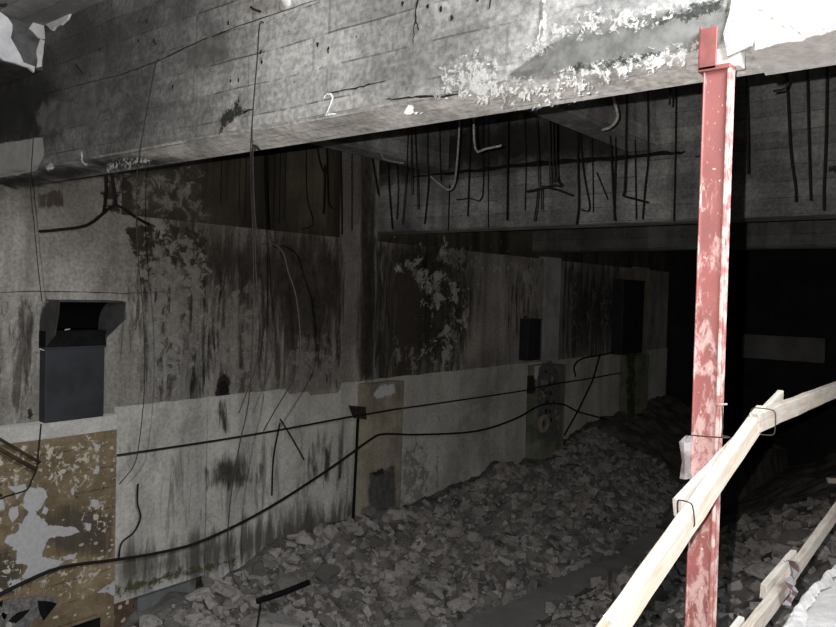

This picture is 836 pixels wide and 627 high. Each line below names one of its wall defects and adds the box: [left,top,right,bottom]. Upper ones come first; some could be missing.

flaking render [0,12,45,73]
crack [411,0,419,43]
spalling [510,0,730,86]
flaking render [755,0,836,50]
water stain [444,119,647,172]
water stain [358,157,473,381]
water stain [121,223,344,399]
water stain [0,297,37,419]
water stain [205,459,246,514]
water stain [307,427,347,483]
peeling [0,434,137,627]
water stain [123,504,352,582]